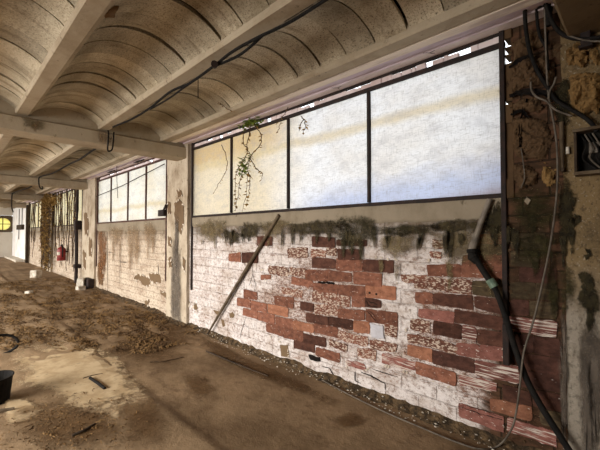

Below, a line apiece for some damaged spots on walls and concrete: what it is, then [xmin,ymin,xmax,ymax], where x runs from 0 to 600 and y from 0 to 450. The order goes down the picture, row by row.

peeling [134,272,166,299]
flaking render [167,189,184,234]
damp [198,201,520,290]
damp [559,216,581,267]
damp [5,221,185,443]
peeling [228,233,563,447]